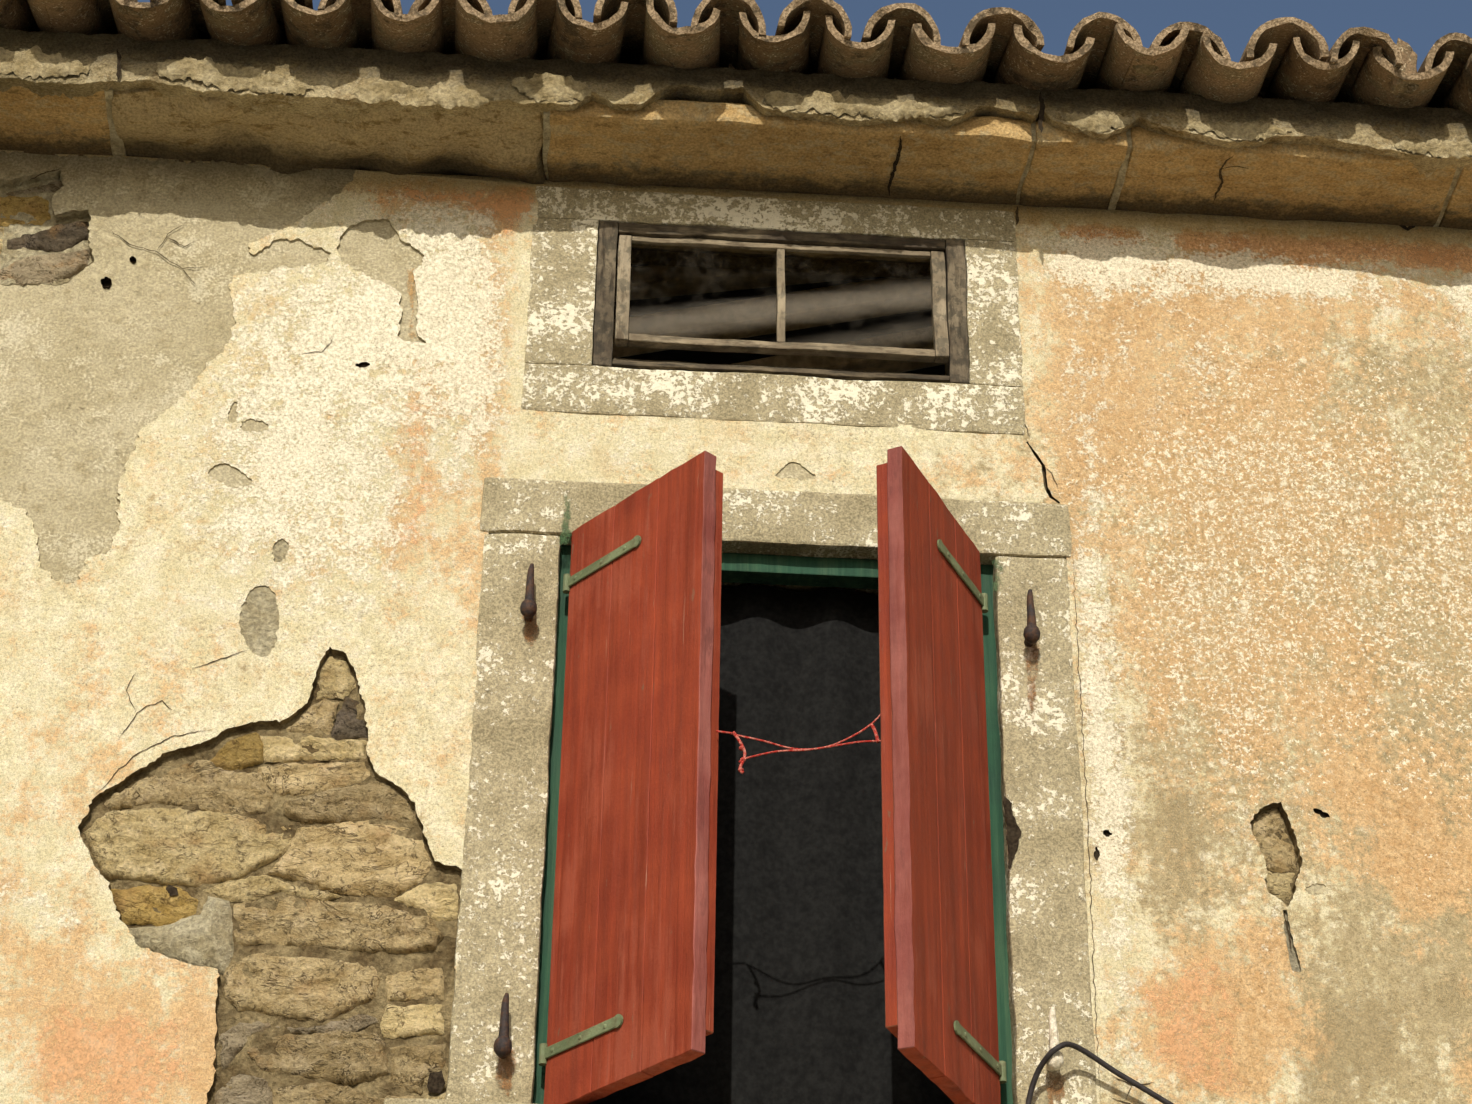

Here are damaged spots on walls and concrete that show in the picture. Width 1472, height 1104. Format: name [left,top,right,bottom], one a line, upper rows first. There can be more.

peeling [0,150,426,584]
crack [1025,424,1060,503]
flaking render [78,647,462,1104]
flaking render [1250,802,1326,972]